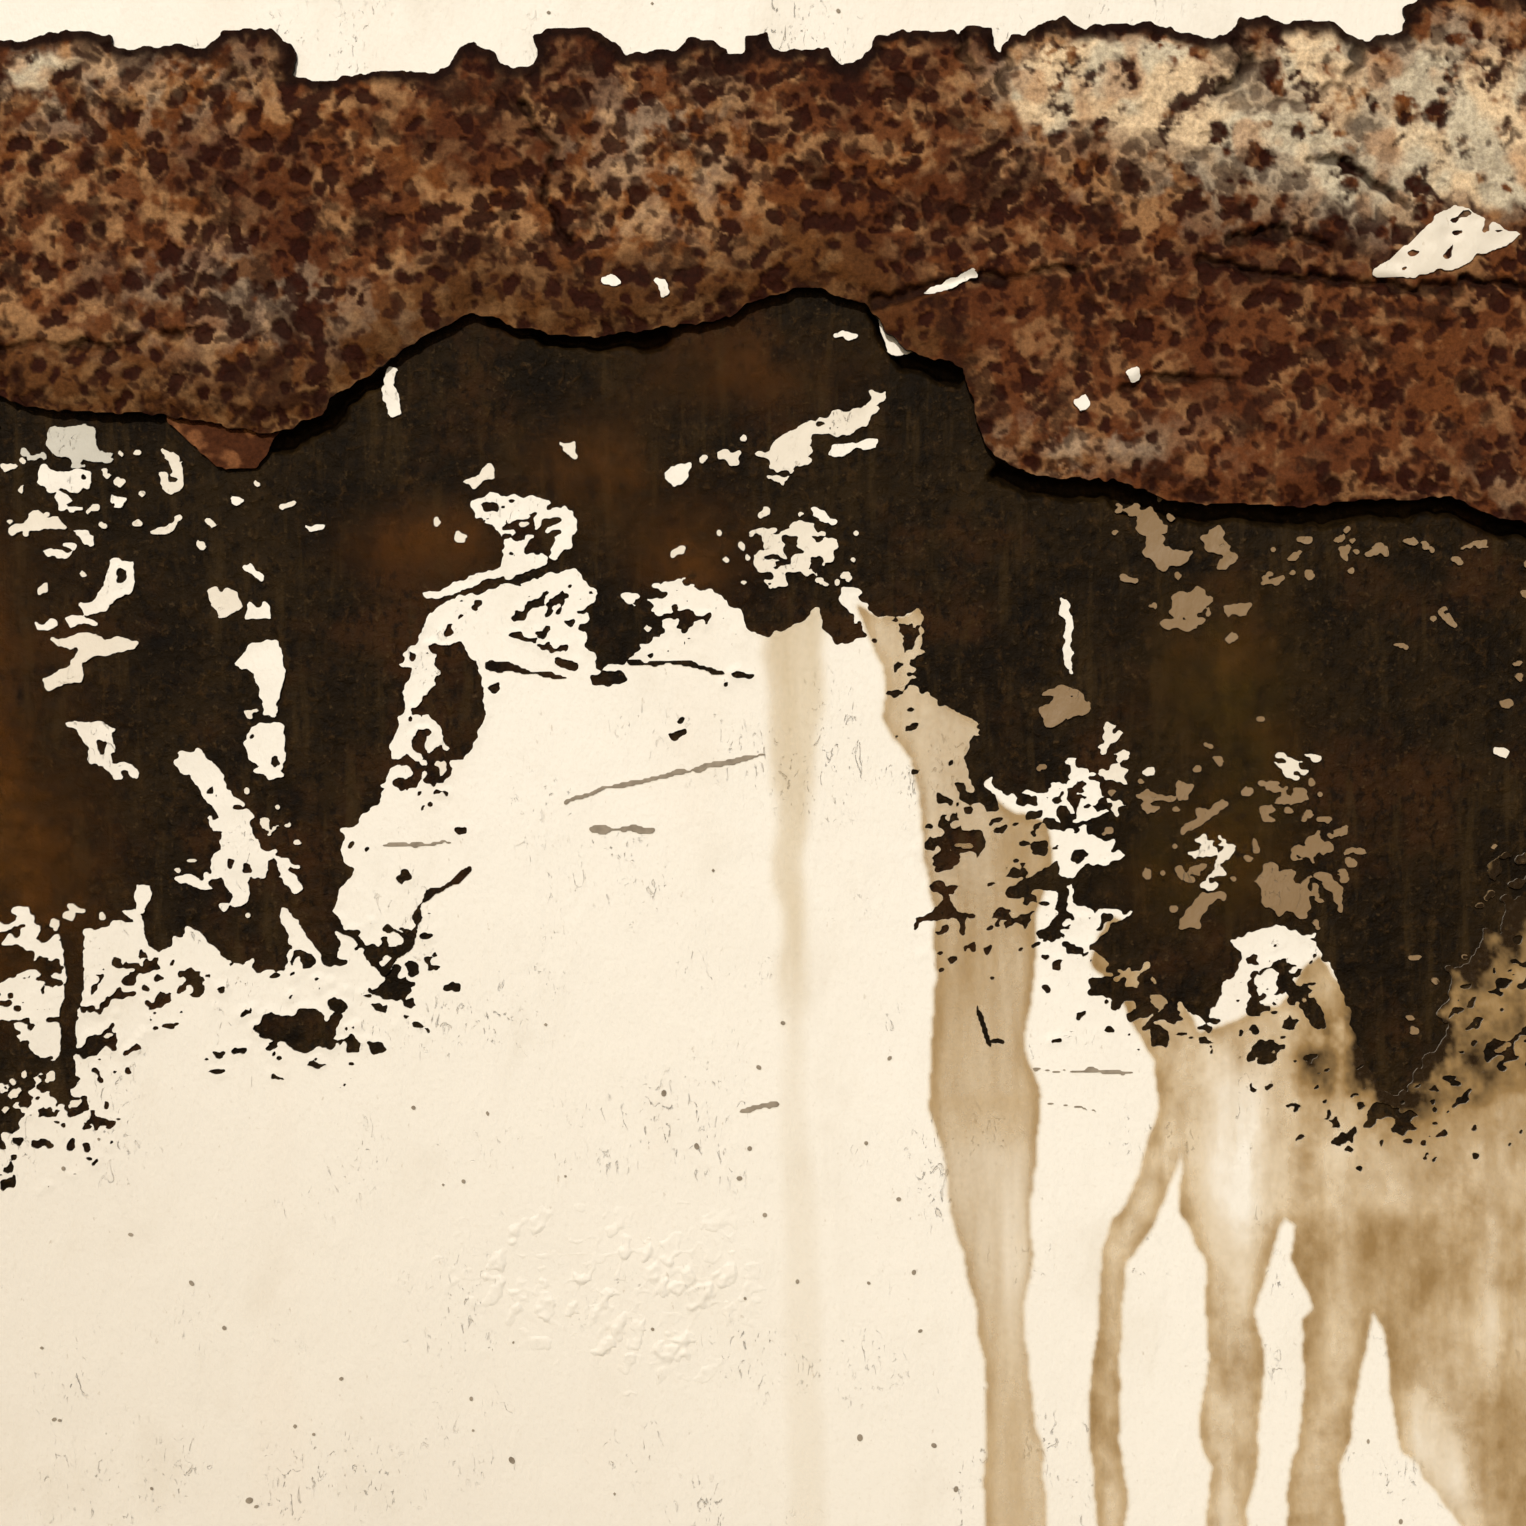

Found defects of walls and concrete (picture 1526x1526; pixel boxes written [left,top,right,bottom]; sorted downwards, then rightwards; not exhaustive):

corrosion [0,0,1526,524]
corrosion [0,759,49,910]
peeling [0,289,1526,1191]